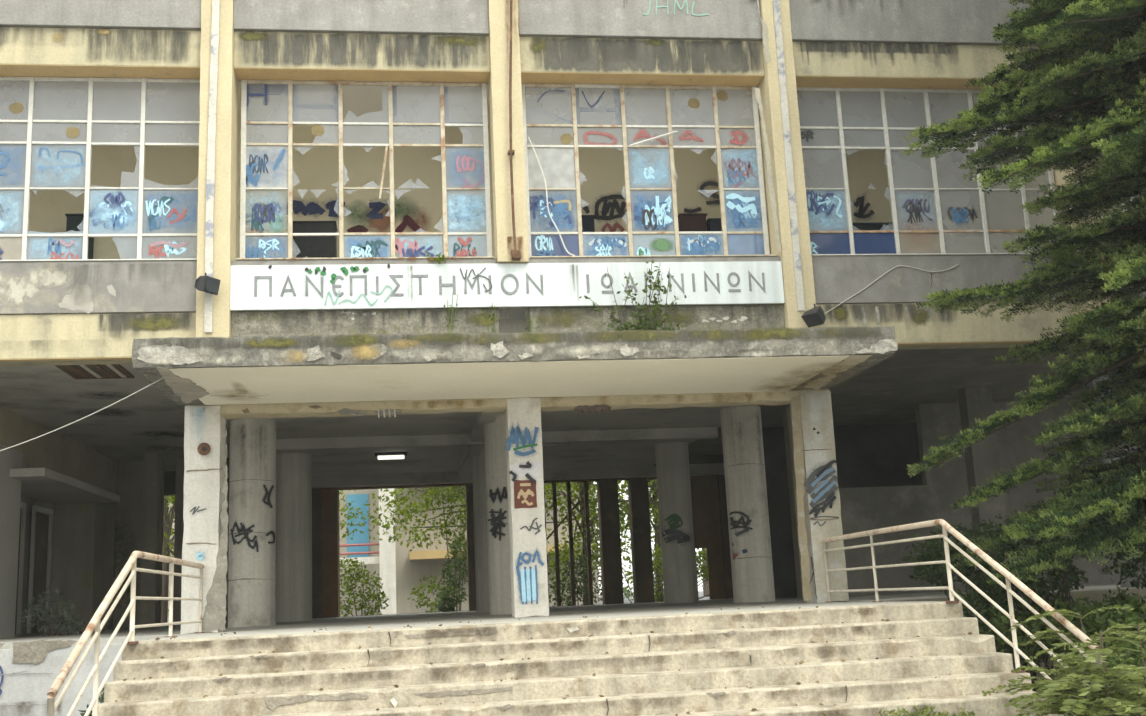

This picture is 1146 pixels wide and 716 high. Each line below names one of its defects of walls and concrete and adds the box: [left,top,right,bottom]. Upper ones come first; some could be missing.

leakage [240,32,484,67]
leakage [532,38,759,73]
leakage [801,42,955,59]
peeling [0,268,94,314]
spalling [307,345,342,361]
spalling [490,341,534,359]
spalling [619,344,640,356]